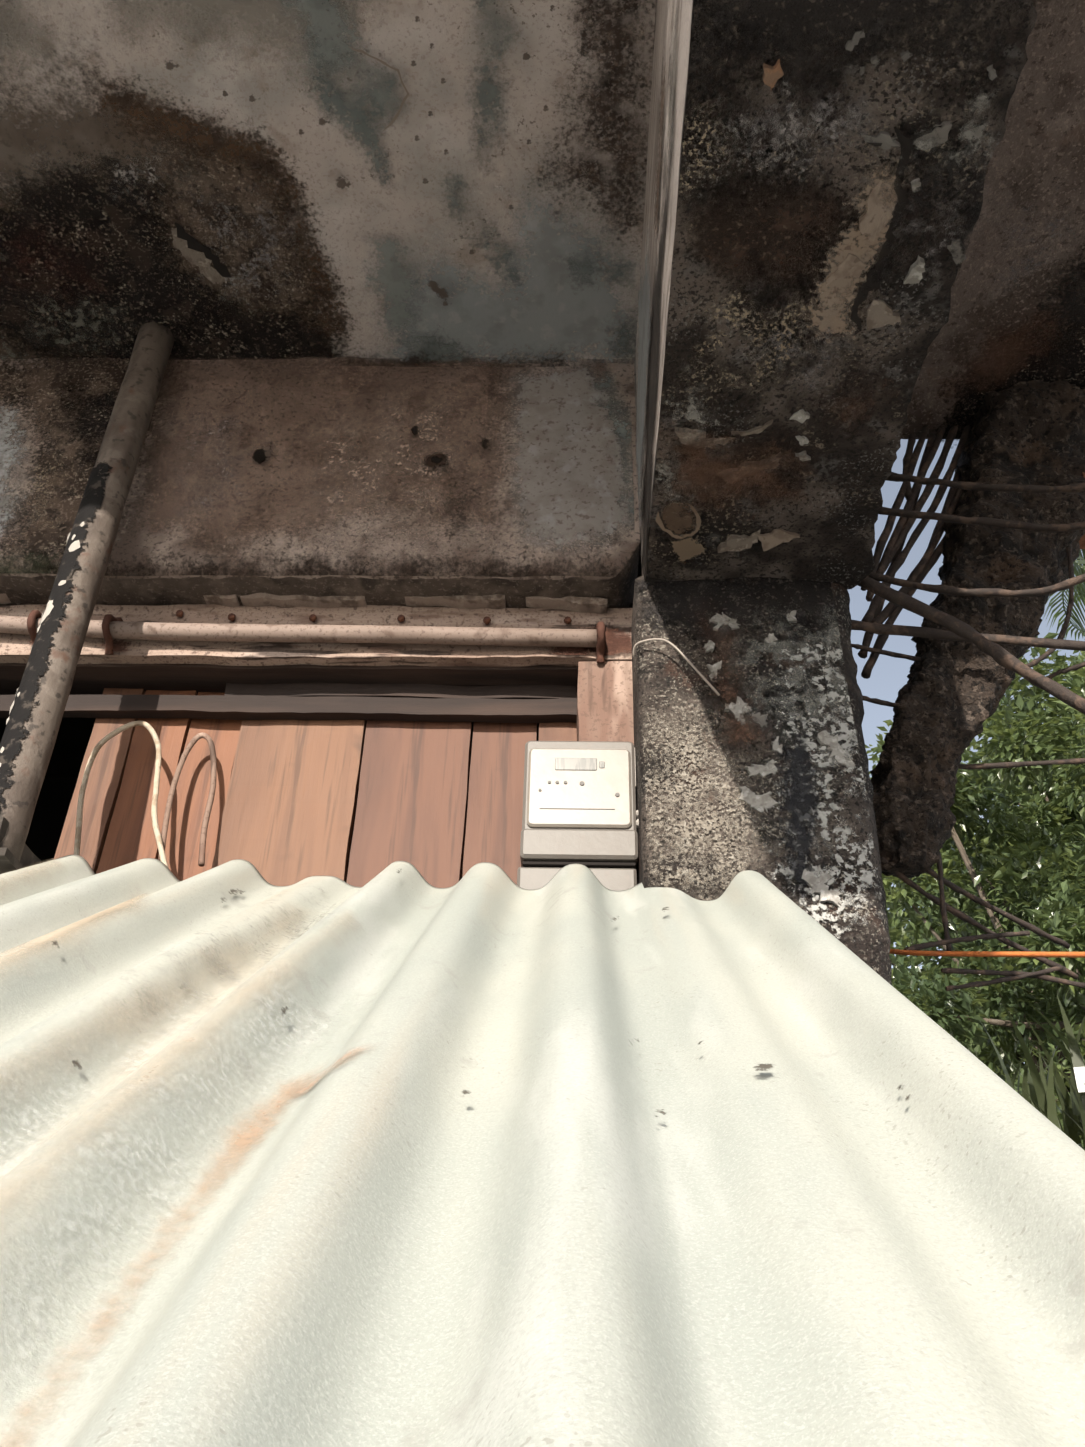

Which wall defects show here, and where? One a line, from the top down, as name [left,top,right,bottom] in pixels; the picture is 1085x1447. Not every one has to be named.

spalling [171,222,231,284]
water stain [0,0,677,577]
water stain [684,176,846,291]
peeling [791,64,997,350]
peeling [675,419,773,448]
peeling [730,409,811,475]
peeling [717,528,800,553]
peeling [703,612,740,679]
spalling [817,380,1085,991]
peeling [724,696,782,813]